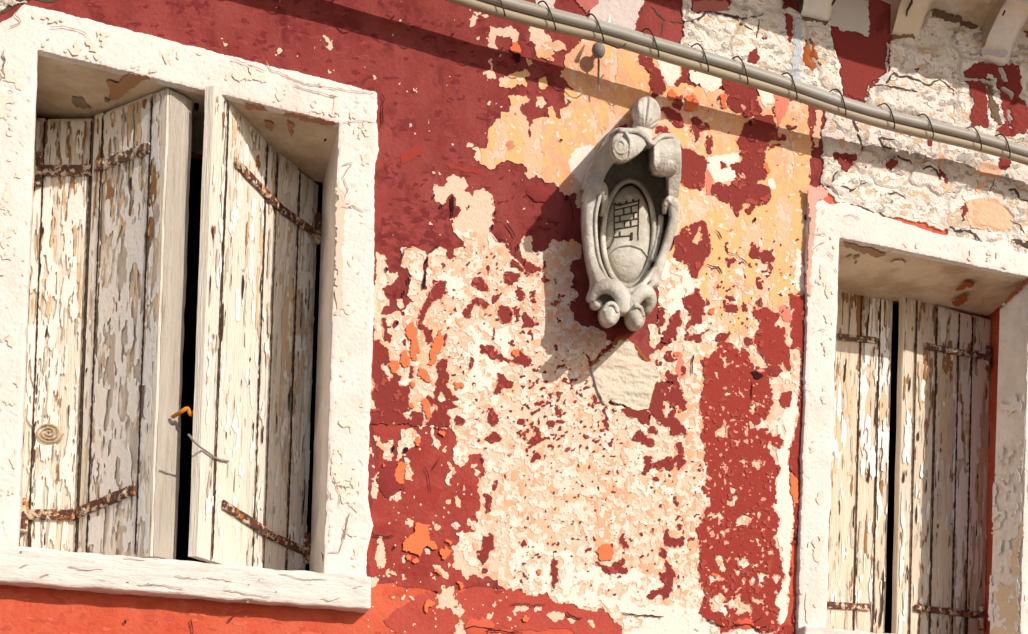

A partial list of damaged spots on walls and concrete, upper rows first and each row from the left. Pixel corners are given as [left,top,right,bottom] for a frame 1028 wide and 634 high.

flaking render [0,0,64,23]
crack [874,72,954,95]
crack [853,120,941,180]
peeling [329,0,1028,634]